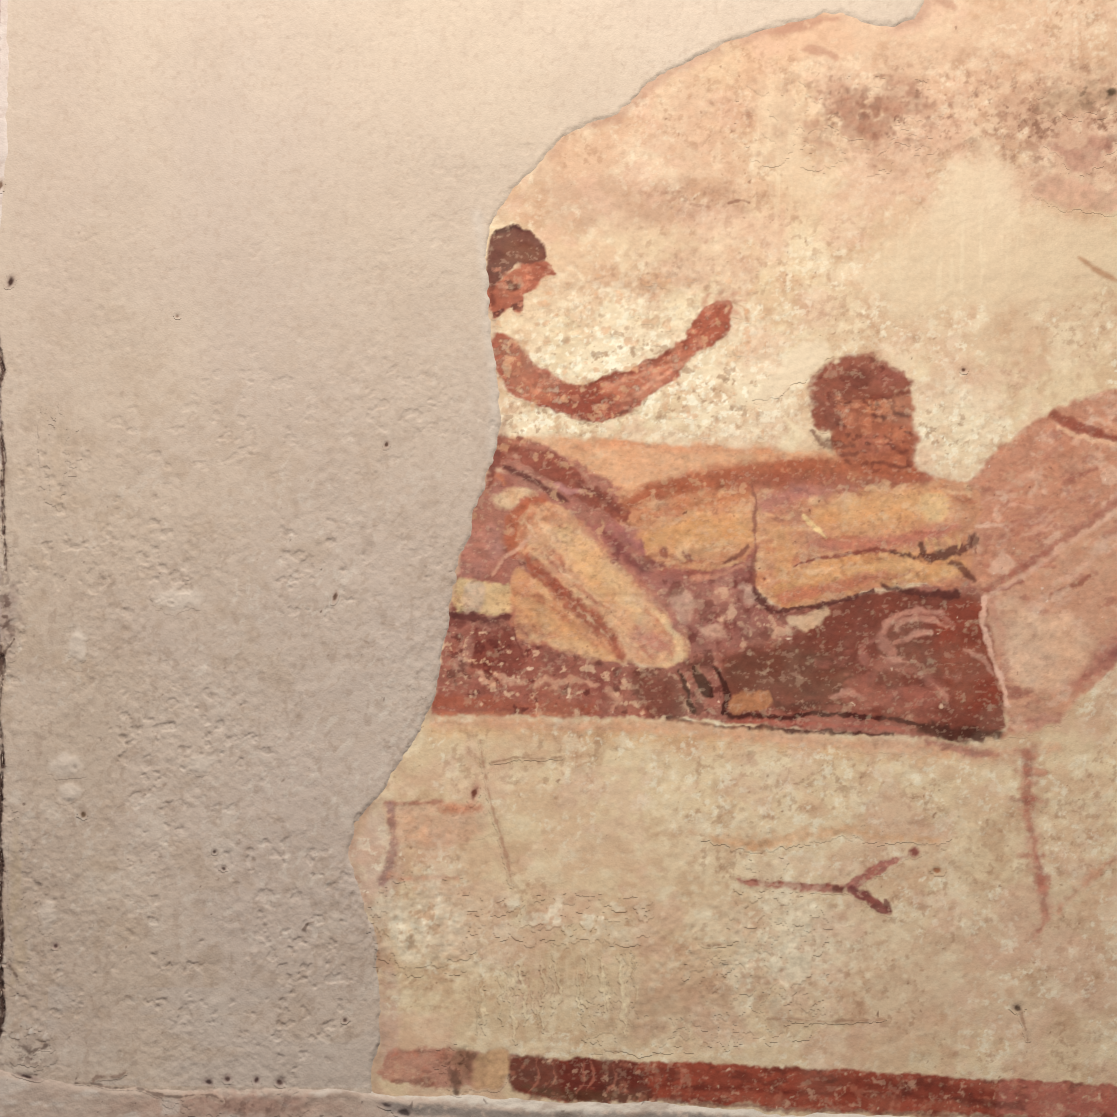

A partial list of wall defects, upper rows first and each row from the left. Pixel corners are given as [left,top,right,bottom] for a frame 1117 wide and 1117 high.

crack [0,332,10,574]
crack [0,637,16,1042]